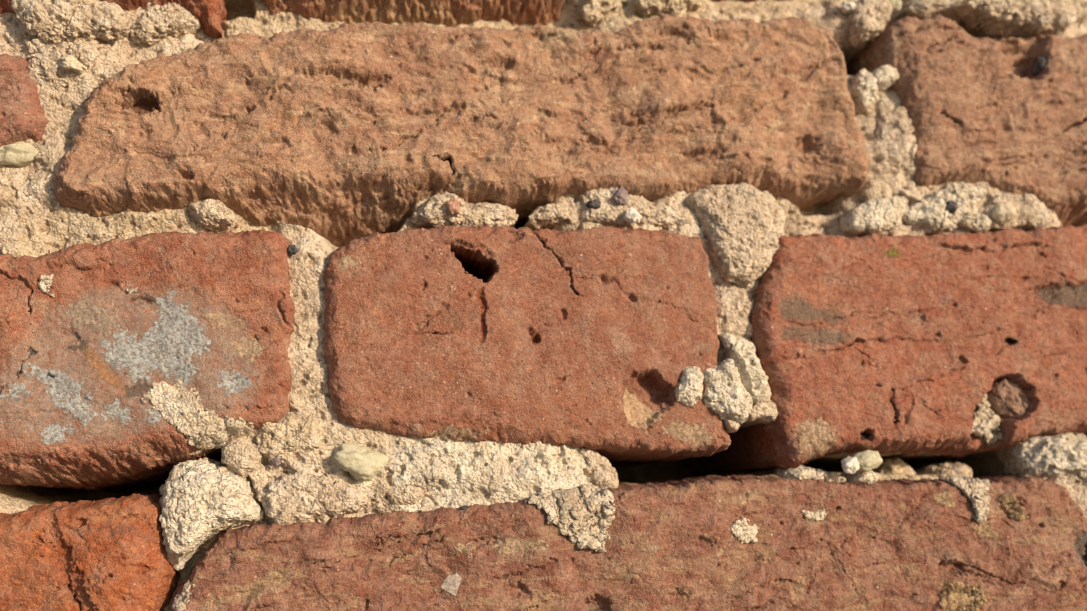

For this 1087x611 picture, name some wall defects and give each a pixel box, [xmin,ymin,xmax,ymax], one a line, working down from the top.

crack [538,239,585,295]
damp [0,290,264,446]
spalling [622,388,663,430]